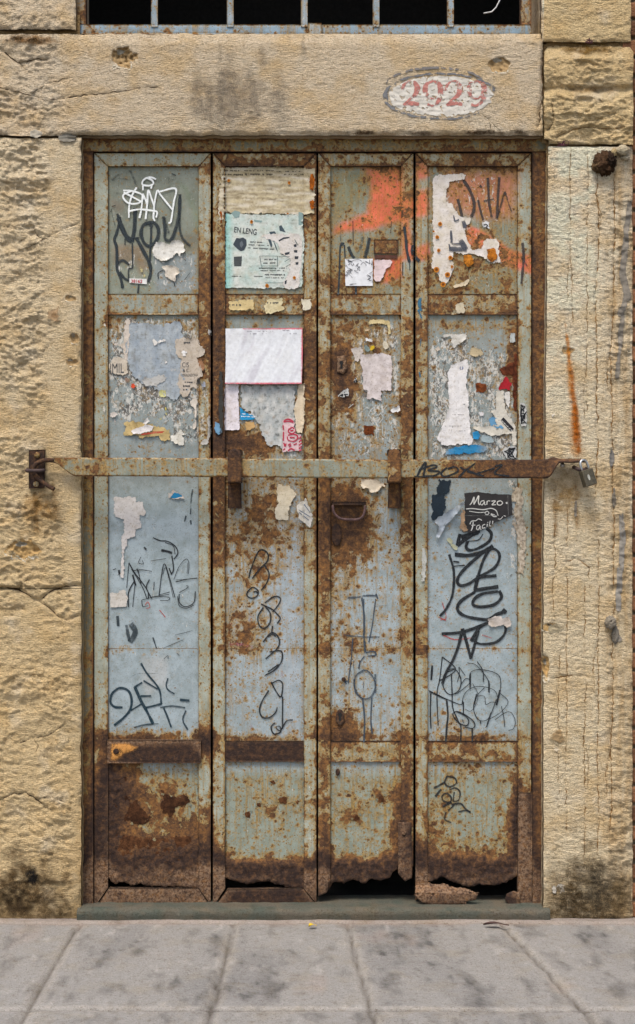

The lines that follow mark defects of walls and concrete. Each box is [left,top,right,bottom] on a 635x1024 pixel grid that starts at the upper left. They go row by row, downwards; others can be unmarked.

spalling [111,46,138,70]
spalling [487,57,512,73]
corrosion [567,336,580,453]
crack [0,580,78,618]
water stain [0,849,67,919]
water stain [550,863,629,919]